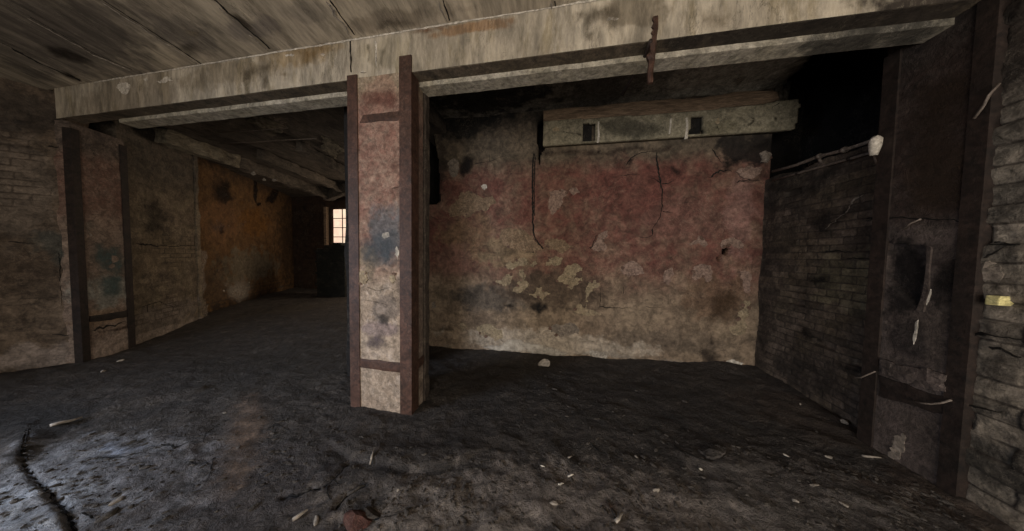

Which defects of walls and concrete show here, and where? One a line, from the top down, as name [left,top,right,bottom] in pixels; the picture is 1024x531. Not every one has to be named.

crack [214,0,270,50]
crack [531,153,544,253]
peeling [548,187,579,215]
crack [621,151,674,238]
peeling [493,227,623,337]
crack [20,428,94,531]